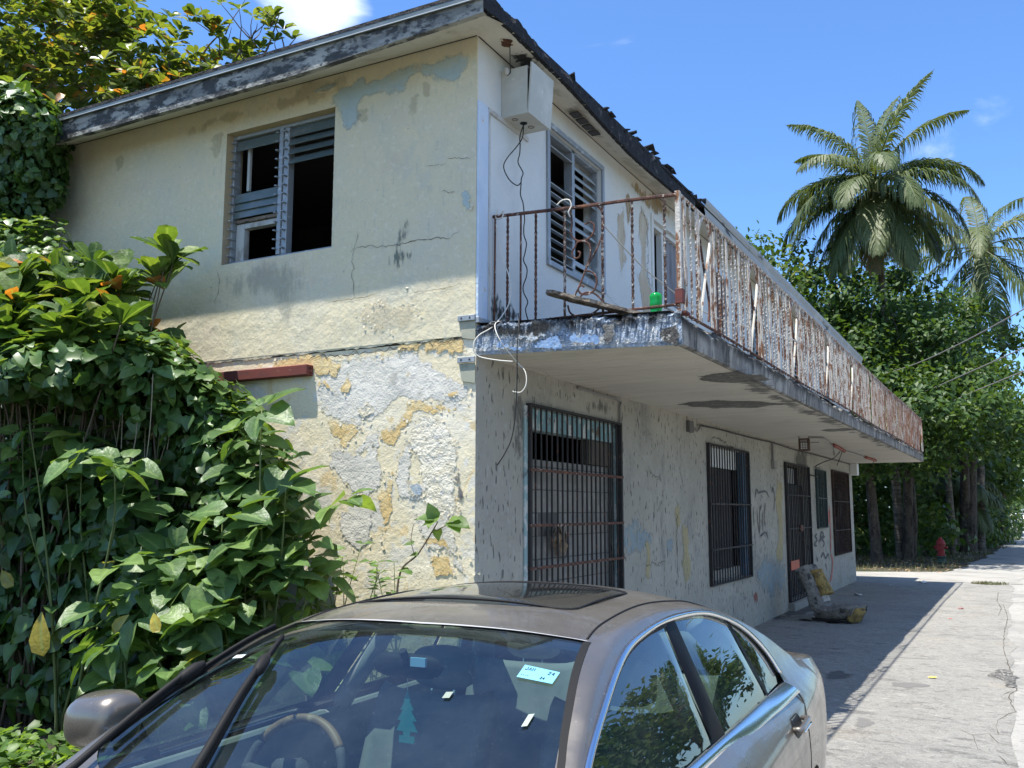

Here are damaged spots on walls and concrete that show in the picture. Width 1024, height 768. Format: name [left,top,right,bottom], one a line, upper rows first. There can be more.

peeling [315,55,467,129]
crack [329,229,461,302]
peeling [495,324,615,351]
spalling [660,325,679,346]
peeling [273,338,480,576]
crack [962,596,1017,764]